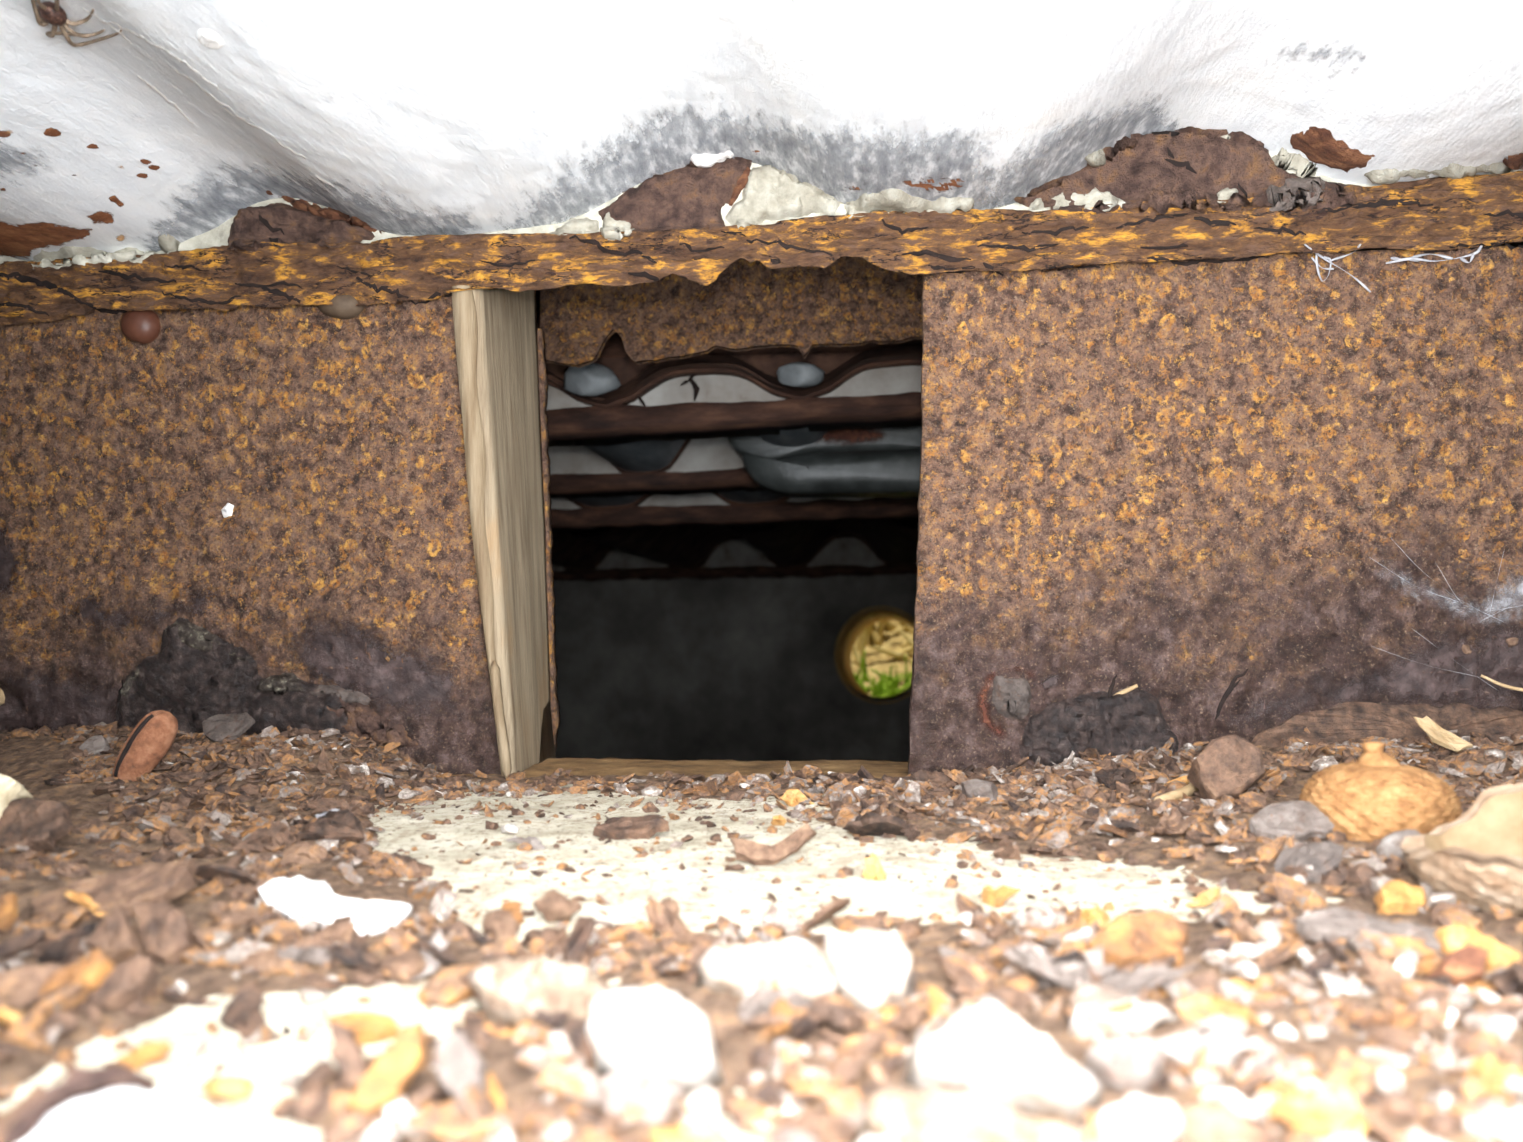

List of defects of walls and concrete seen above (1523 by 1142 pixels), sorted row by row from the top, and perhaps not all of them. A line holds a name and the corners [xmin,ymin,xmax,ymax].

corrosion [44,128,61,137]
corrosion [137,159,160,178]
peeling [516,103,1375,234]
spalling [1503,153,1523,172]
peeling [148,163,473,253]
crack [0,265,314,316]
crack [337,266,452,305]